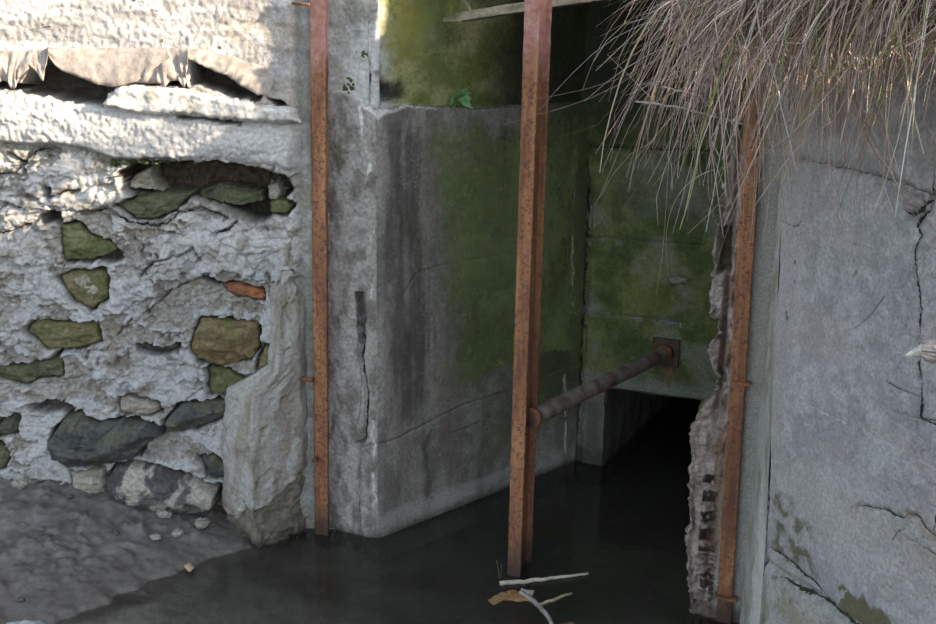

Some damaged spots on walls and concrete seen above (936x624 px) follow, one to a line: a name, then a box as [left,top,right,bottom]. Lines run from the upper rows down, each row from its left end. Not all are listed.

flaking render [0,39,303,125]
spalling [118,160,294,196]
spalling [234,198,272,217]
crack [813,161,936,425]
spalling [226,472,306,541]
spalling [689,416,715,602]
water stain [773,495,812,571]
crack [859,503,936,555]
crack [773,549,860,624]
water stain [838,585,890,624]